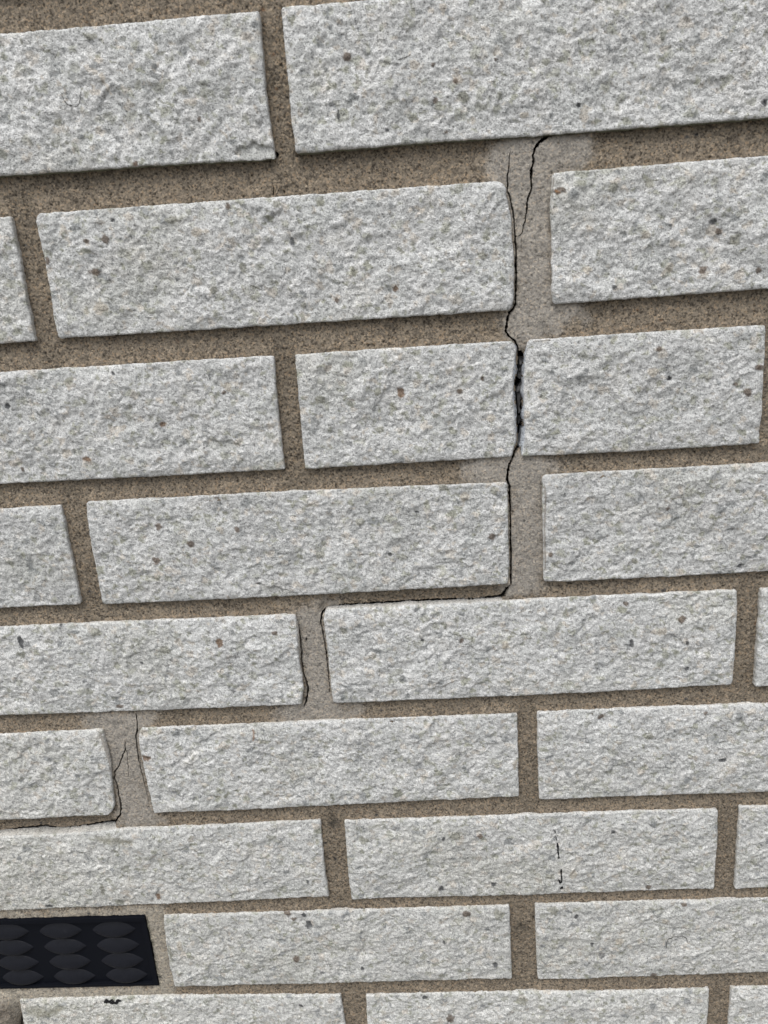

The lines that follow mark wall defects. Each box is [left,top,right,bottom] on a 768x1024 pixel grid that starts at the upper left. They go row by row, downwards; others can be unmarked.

crack [301,137,543,703]
crack [12,809,122,829]